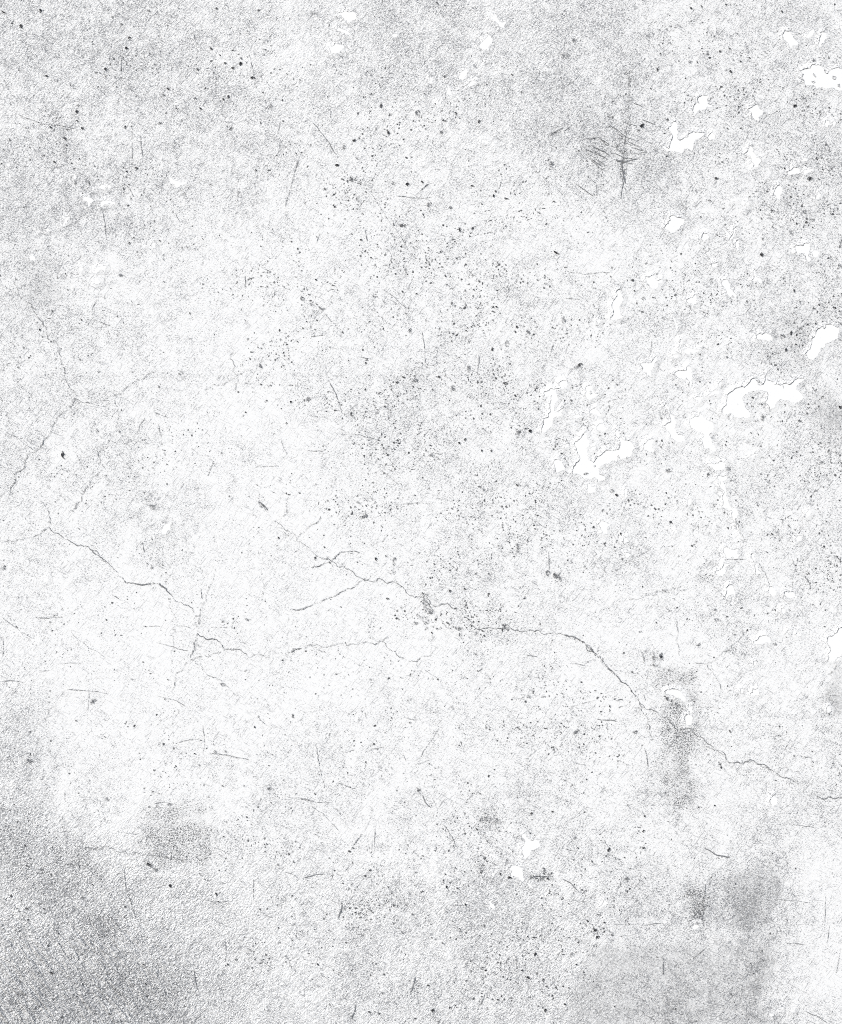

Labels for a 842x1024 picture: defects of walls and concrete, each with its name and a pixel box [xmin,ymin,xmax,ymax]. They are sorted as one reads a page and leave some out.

peeling [560,427,639,496]
crack [6,510,432,696]
crack [278,501,842,800]